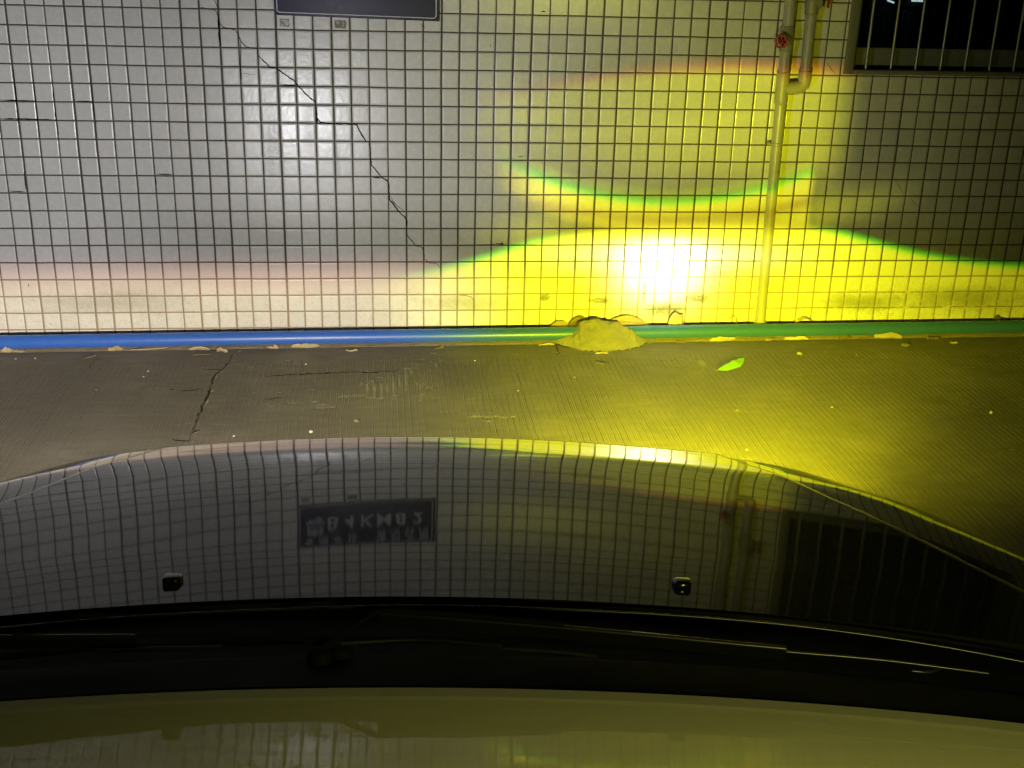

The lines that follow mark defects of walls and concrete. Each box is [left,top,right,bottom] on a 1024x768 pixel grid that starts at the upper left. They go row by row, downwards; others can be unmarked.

crack [199,0,441,269]
crack [171,351,240,442]